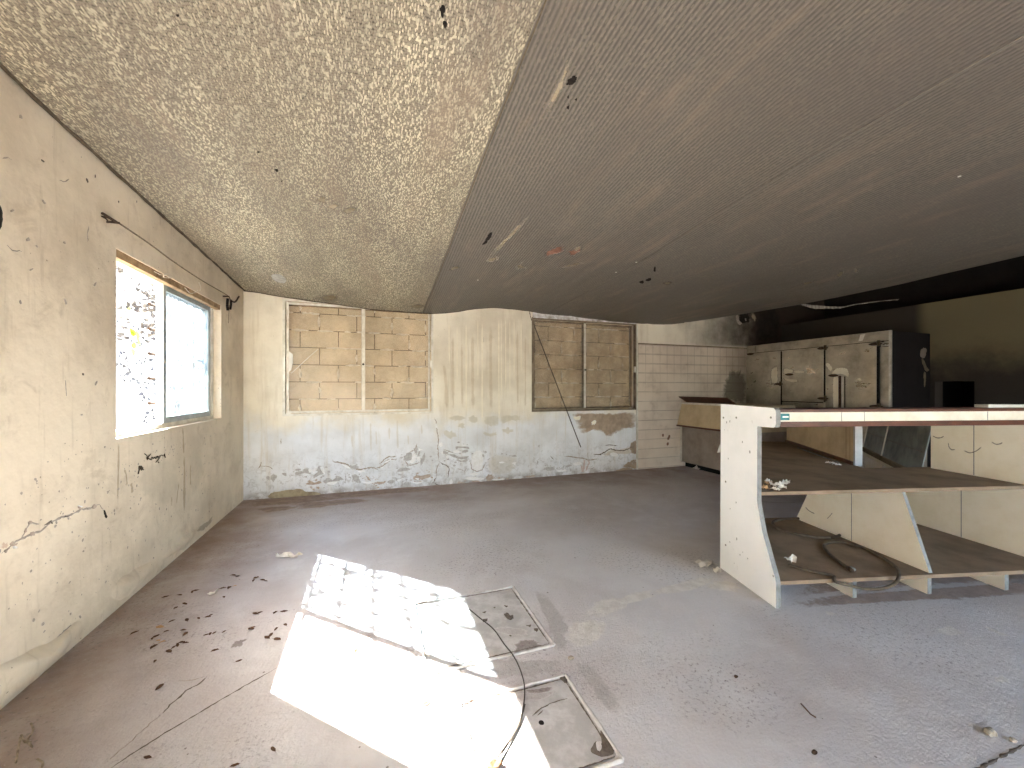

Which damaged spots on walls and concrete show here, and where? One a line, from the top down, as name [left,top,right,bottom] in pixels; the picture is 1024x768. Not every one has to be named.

flaking render [262,442,518,490]
crack [2,504,108,553]
crack [110,668,276,767]